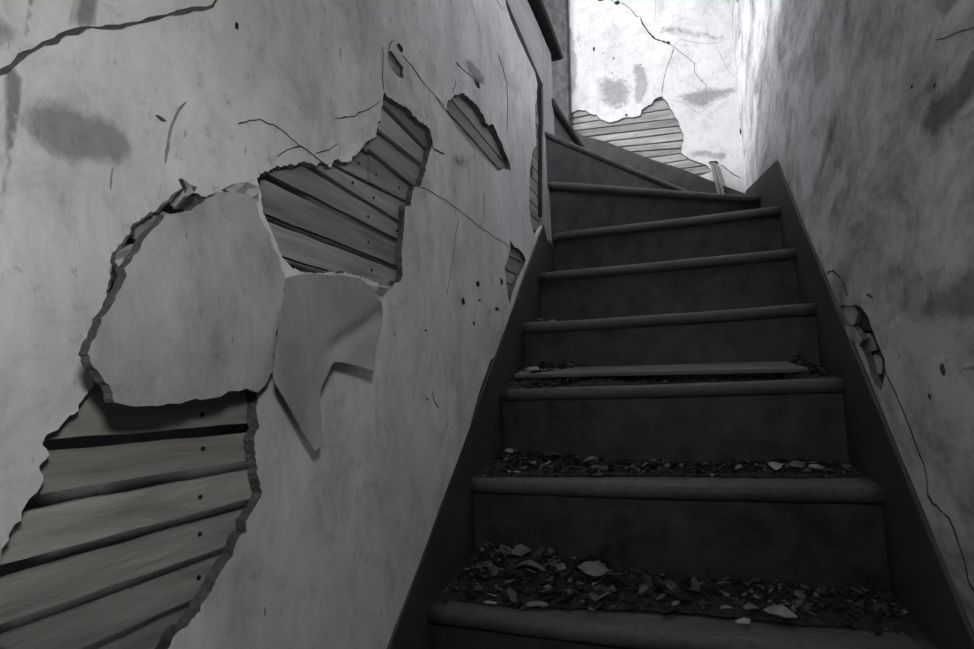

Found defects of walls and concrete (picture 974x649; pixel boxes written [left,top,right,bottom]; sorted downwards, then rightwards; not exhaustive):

crack [0,0,217,75]
crack [334,41,475,119]
leakage [601,65,646,105]
crack [611,0,730,115]
crack [165,102,186,164]
crack [238,119,339,165]
flaking render [446,93,511,171]
flaking render [571,97,719,176]
flaking render [116,188,206,250]
flaking render [258,92,433,286]
flaking render [500,241,526,302]
flaking render [0,380,262,649]